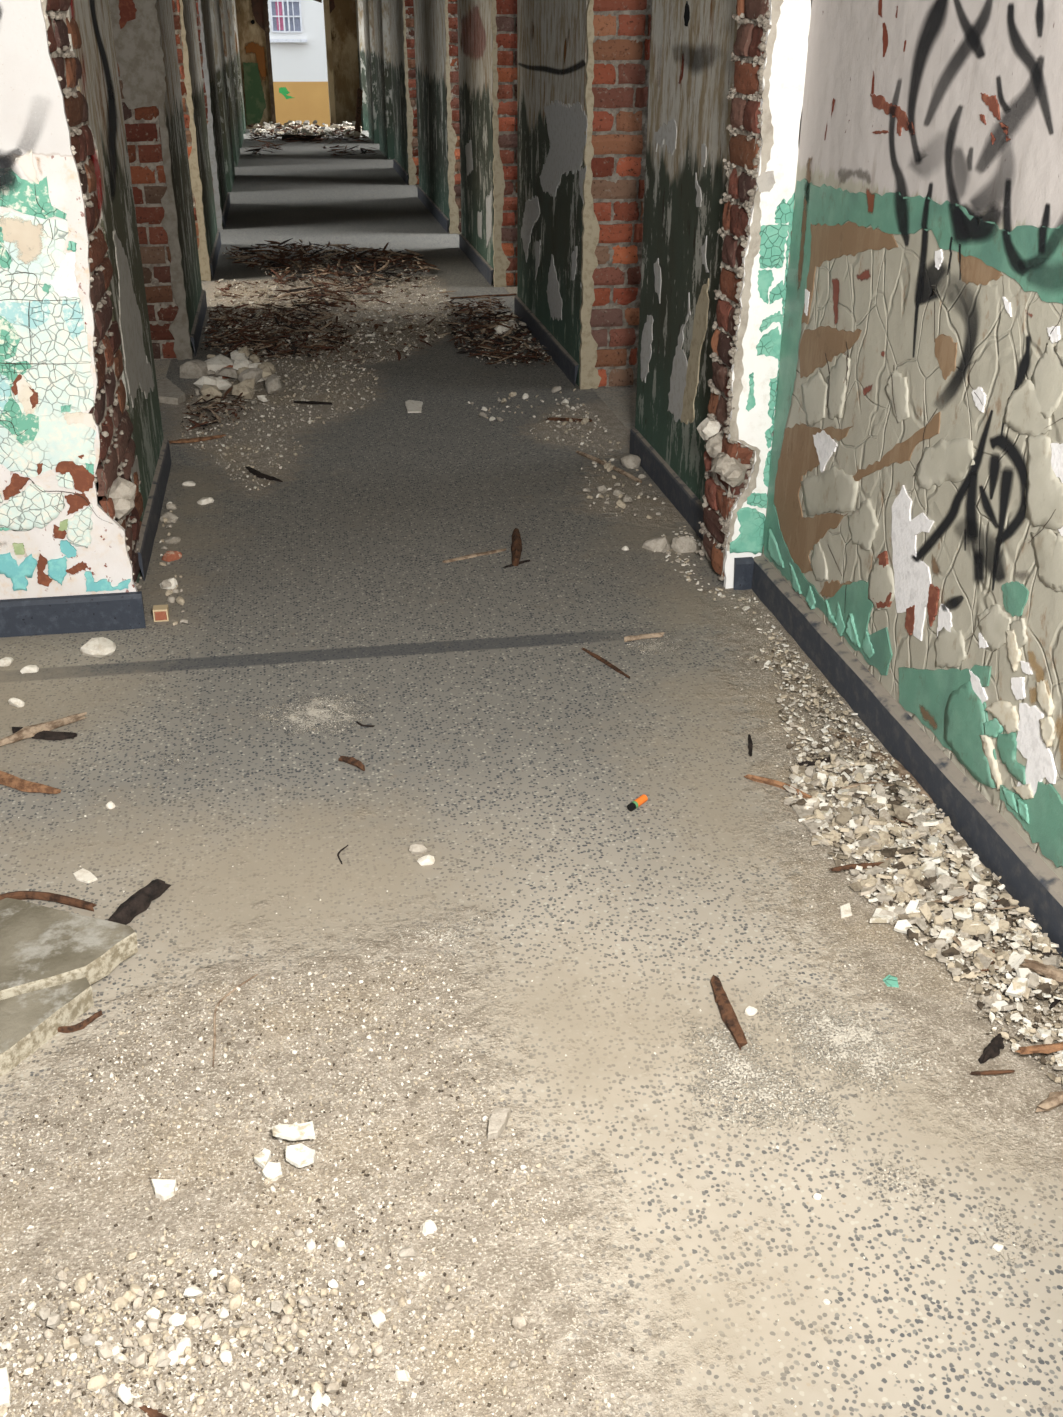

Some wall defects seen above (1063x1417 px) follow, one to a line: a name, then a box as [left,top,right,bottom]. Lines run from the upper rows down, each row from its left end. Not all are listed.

peeling [109,0,167,109]
crack [0,184,79,379]
peeling [0,0,154,592]
peeling [640,258,662,383]
crack [825,342,849,407]
spalling [664,0,1063,868]
crack [891,365,937,479]